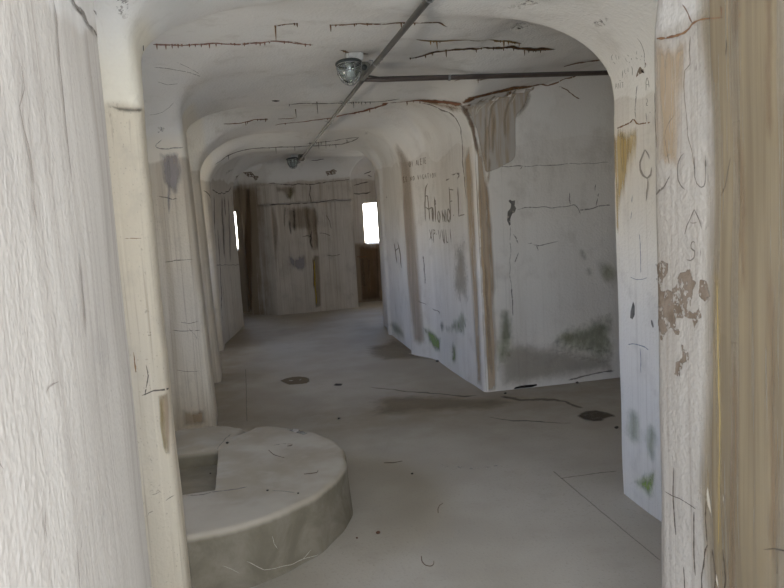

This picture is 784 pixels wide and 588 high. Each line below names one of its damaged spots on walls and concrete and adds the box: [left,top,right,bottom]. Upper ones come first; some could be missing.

crack [72,0,97,36]
crack [330,22,555,60]
crack [478,60,600,99]
crack [216,99,466,193]
damp [164,156,179,207]
crack [269,171,371,246]
crack [518,185,608,212]
peeling [651,261,710,340]
peeling [675,345,689,376]